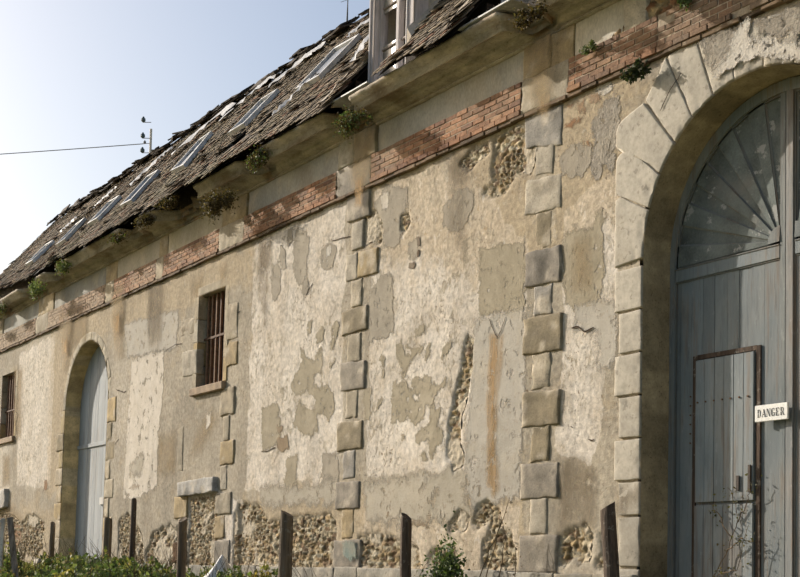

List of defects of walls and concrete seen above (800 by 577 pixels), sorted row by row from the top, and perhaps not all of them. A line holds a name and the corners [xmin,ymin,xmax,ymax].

peeling [697,7,800,72]
flaking render [461,122,536,198]
peeling [291,319,339,438]
peeling [367,273,474,470]
peeling [261,402,298,492]
corrosion [488,337,497,493]
flaking render [0,513,45,560]
flaking render [233,503,280,567]
flaking render [292,513,338,568]
flaking render [359,532,400,568]
flaking render [411,545,459,569]
flaking render [449,501,517,571]